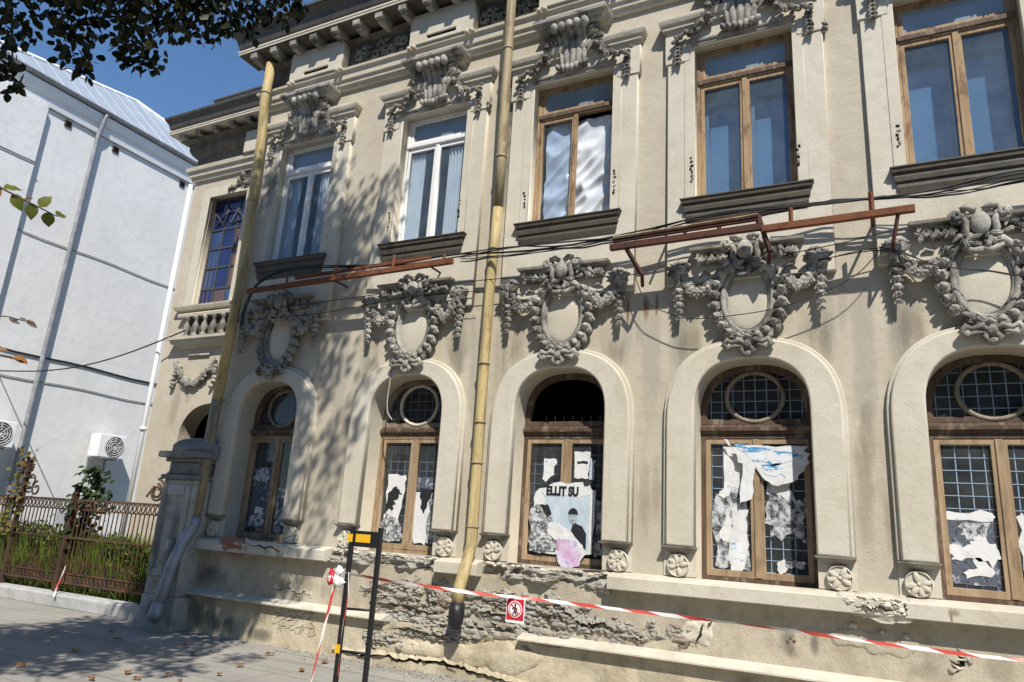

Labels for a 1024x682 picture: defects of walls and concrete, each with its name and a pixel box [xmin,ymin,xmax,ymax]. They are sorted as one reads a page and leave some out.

flaking render [219,536,247,557]
spalling [484,561,559,572]
crack [245,538,530,682]
flaking render [358,574,692,655]
flaking render [829,591,920,659]